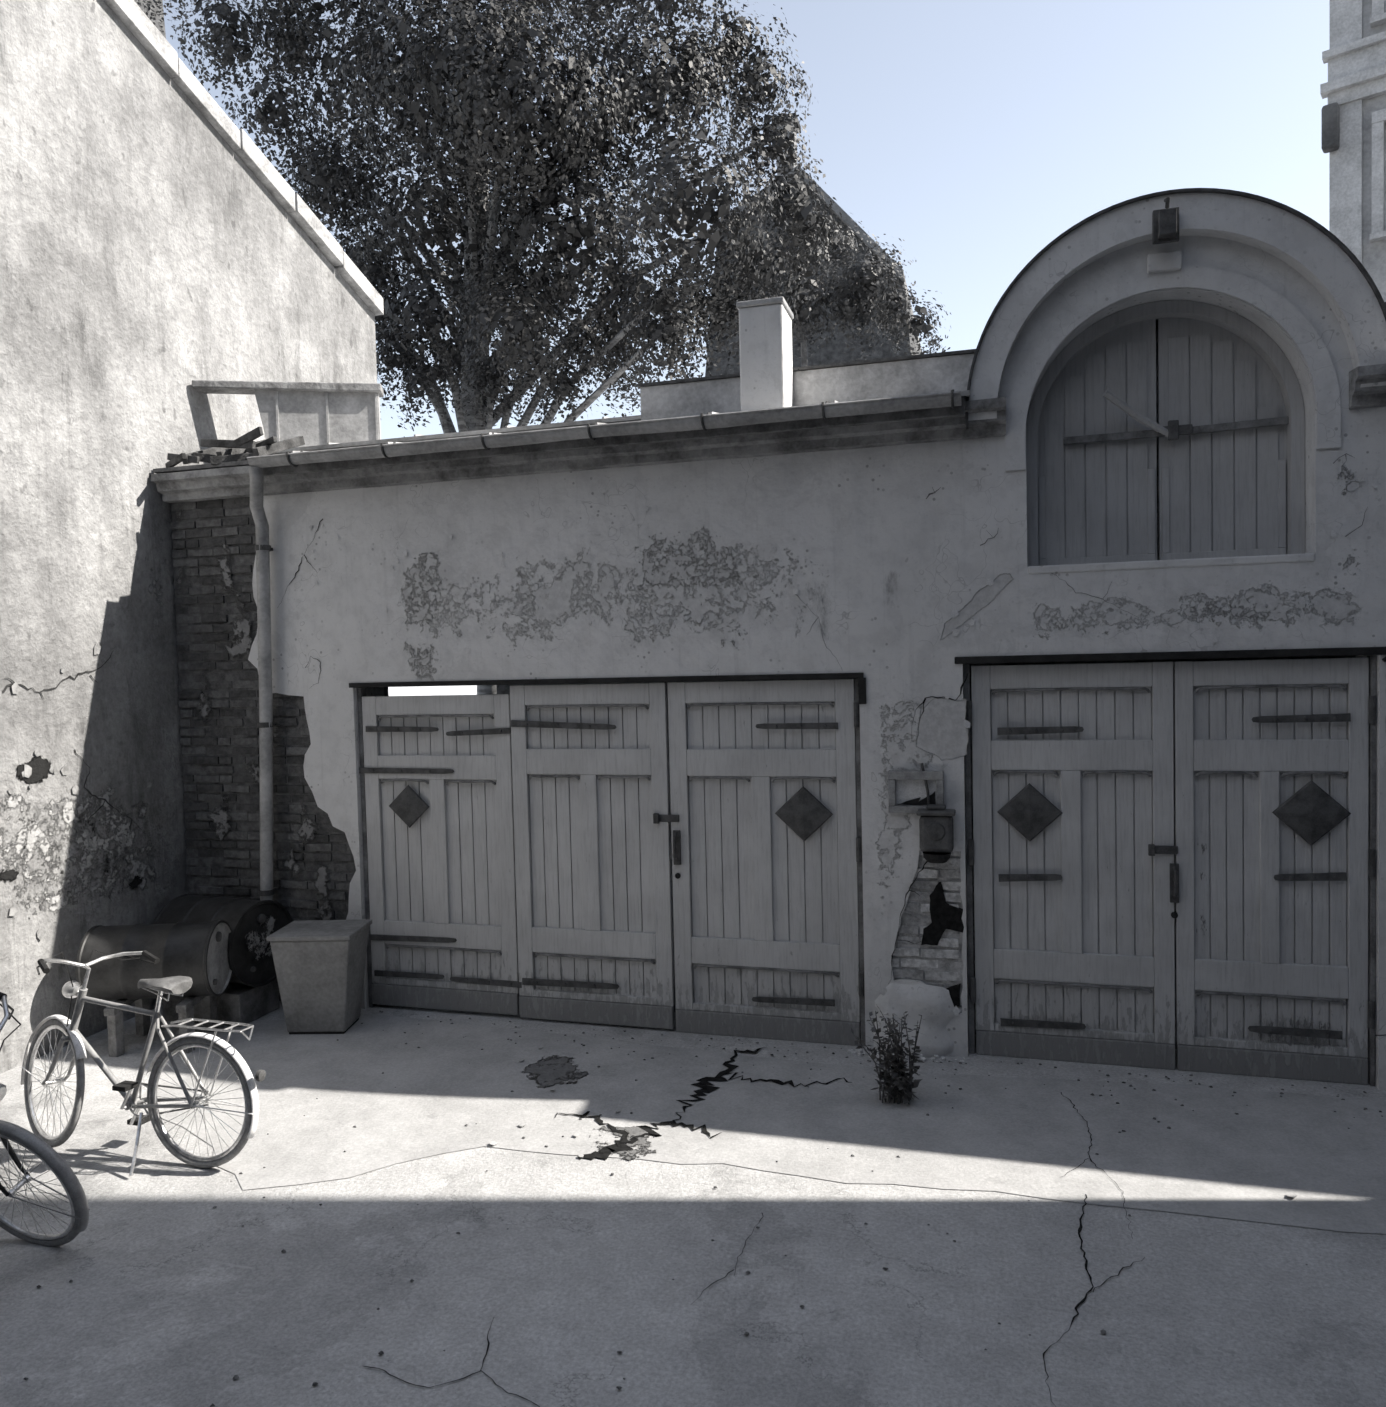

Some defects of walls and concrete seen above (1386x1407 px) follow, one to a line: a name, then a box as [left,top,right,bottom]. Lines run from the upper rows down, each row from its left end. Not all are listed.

peeling [385,526,829,681]
spalling [940,573,1013,640]
peeling [1033,549,1362,643]
flaking render [0,497,356,963]
peeling [875,694,970,915]
flaking render [891,850,964,1013]
crack [555,1047,852,1159]
crack [1043,1092,1145,1403]